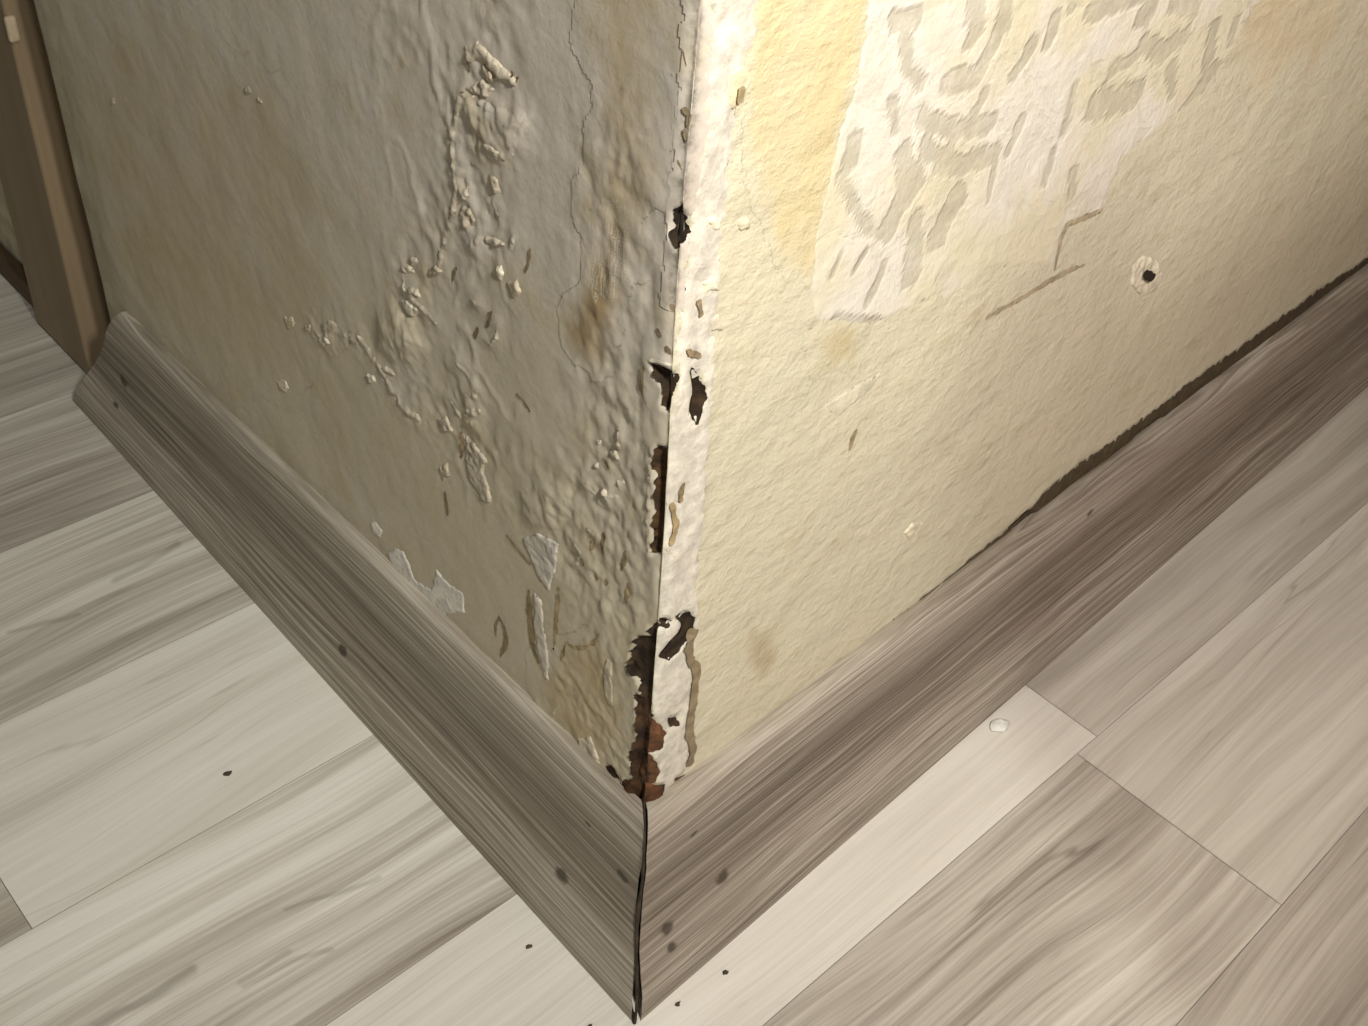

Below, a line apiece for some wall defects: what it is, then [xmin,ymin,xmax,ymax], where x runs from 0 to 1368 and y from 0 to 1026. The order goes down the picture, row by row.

peeling [464,40,519,98]
leakage [734,0,870,289]
peeling [458,186,505,247]
leakage [557,0,678,383]
peeling [399,257,443,316]
peeling [496,265,522,299]
spalling [639,0,759,790]
peeling [371,522,465,615]
spalling [569,528,630,604]
peeling [578,736,600,763]
corrosion [606,618,684,807]
crack [633,802,646,1025]